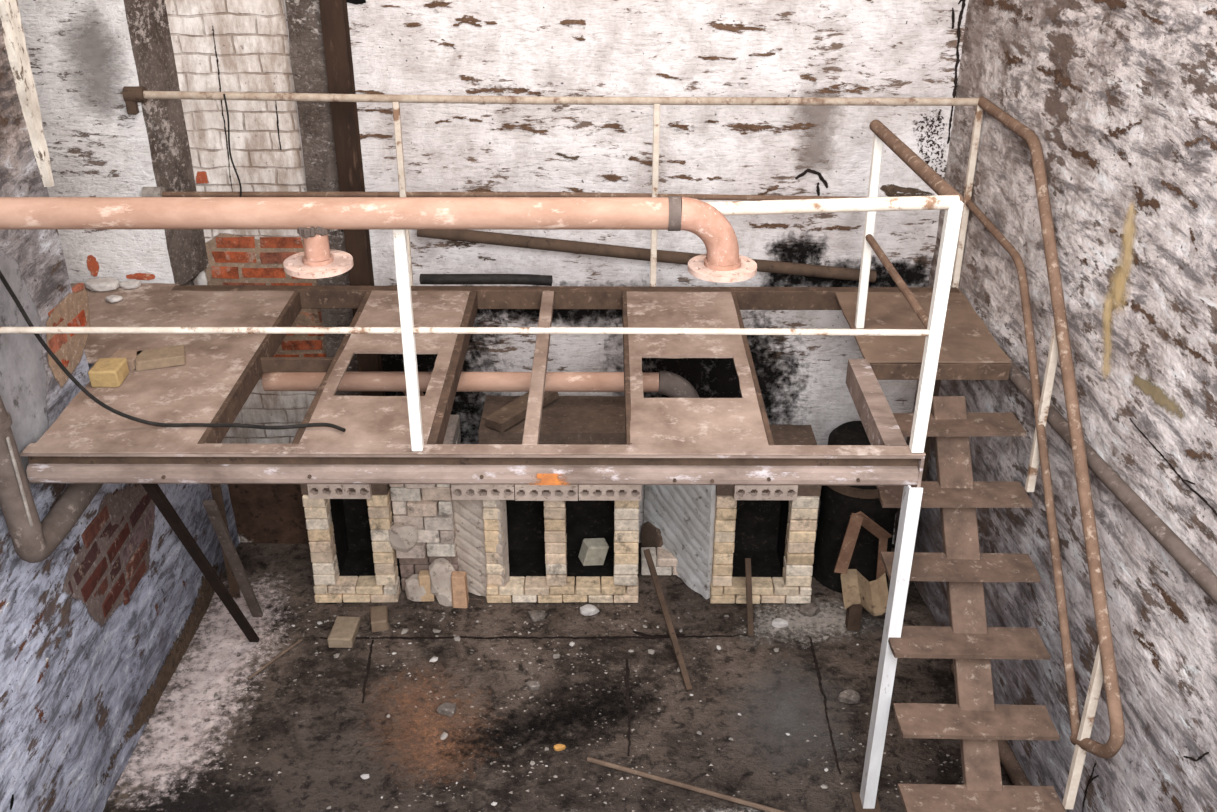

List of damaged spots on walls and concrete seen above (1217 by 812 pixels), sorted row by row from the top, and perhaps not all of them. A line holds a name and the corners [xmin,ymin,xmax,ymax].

flaking render [424,0,497,27]
flaking render [707,19,767,34]
flaking render [460,75,544,96]
flaking render [799,73,869,97]
crack [947,0,966,144]
flaking render [435,116,549,135]
flaking render [668,120,819,135]
flaking render [628,156,732,181]
flaking render [1134,181,1198,214]
flaking render [205,233,318,286]
flaking render [273,309,326,357]
flaking render [62,484,155,628]